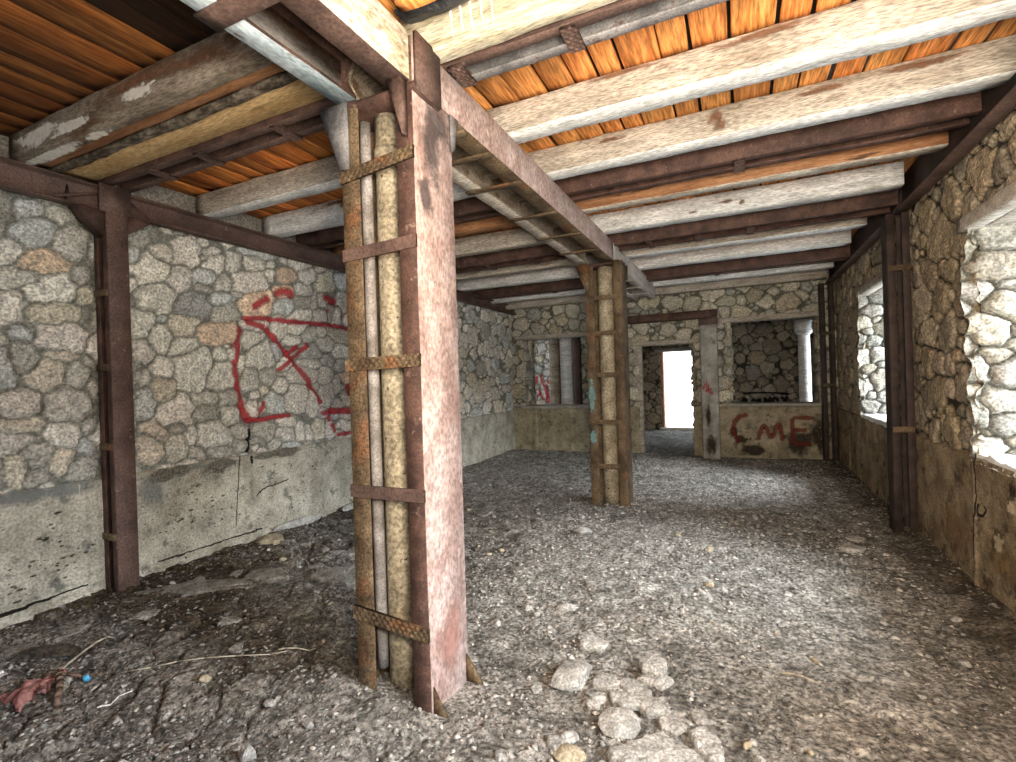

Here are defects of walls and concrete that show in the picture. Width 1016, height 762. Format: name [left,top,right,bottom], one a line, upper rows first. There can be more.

crack [158,428,289,562]
crack [973,454,987,557]
crack [0,584,88,618]